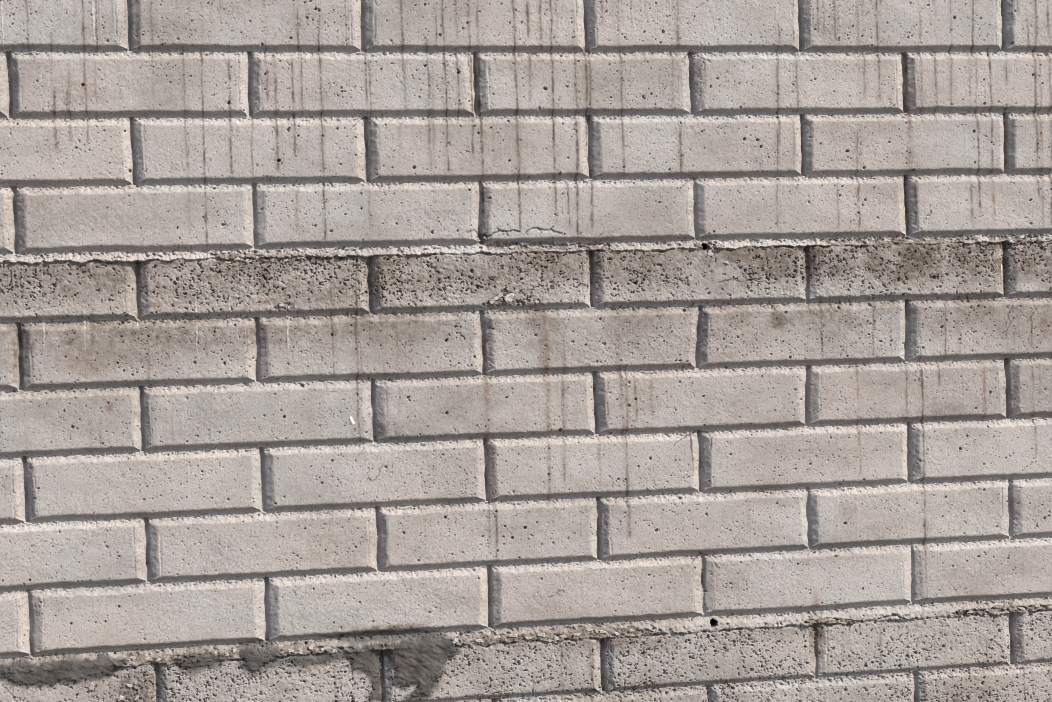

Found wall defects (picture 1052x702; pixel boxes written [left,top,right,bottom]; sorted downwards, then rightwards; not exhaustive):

leakage [444,55,484,164]